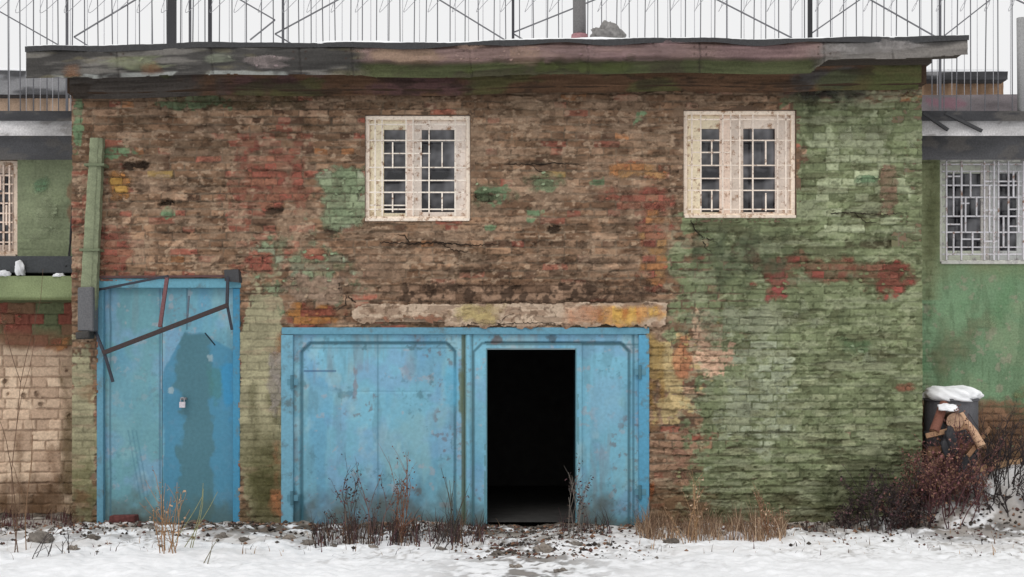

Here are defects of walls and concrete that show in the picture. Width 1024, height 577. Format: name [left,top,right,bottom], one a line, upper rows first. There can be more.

crack [507,162,583,172]
crack [831,212,903,223]
crack [380,234,500,253]
peeling [730,244,916,301]